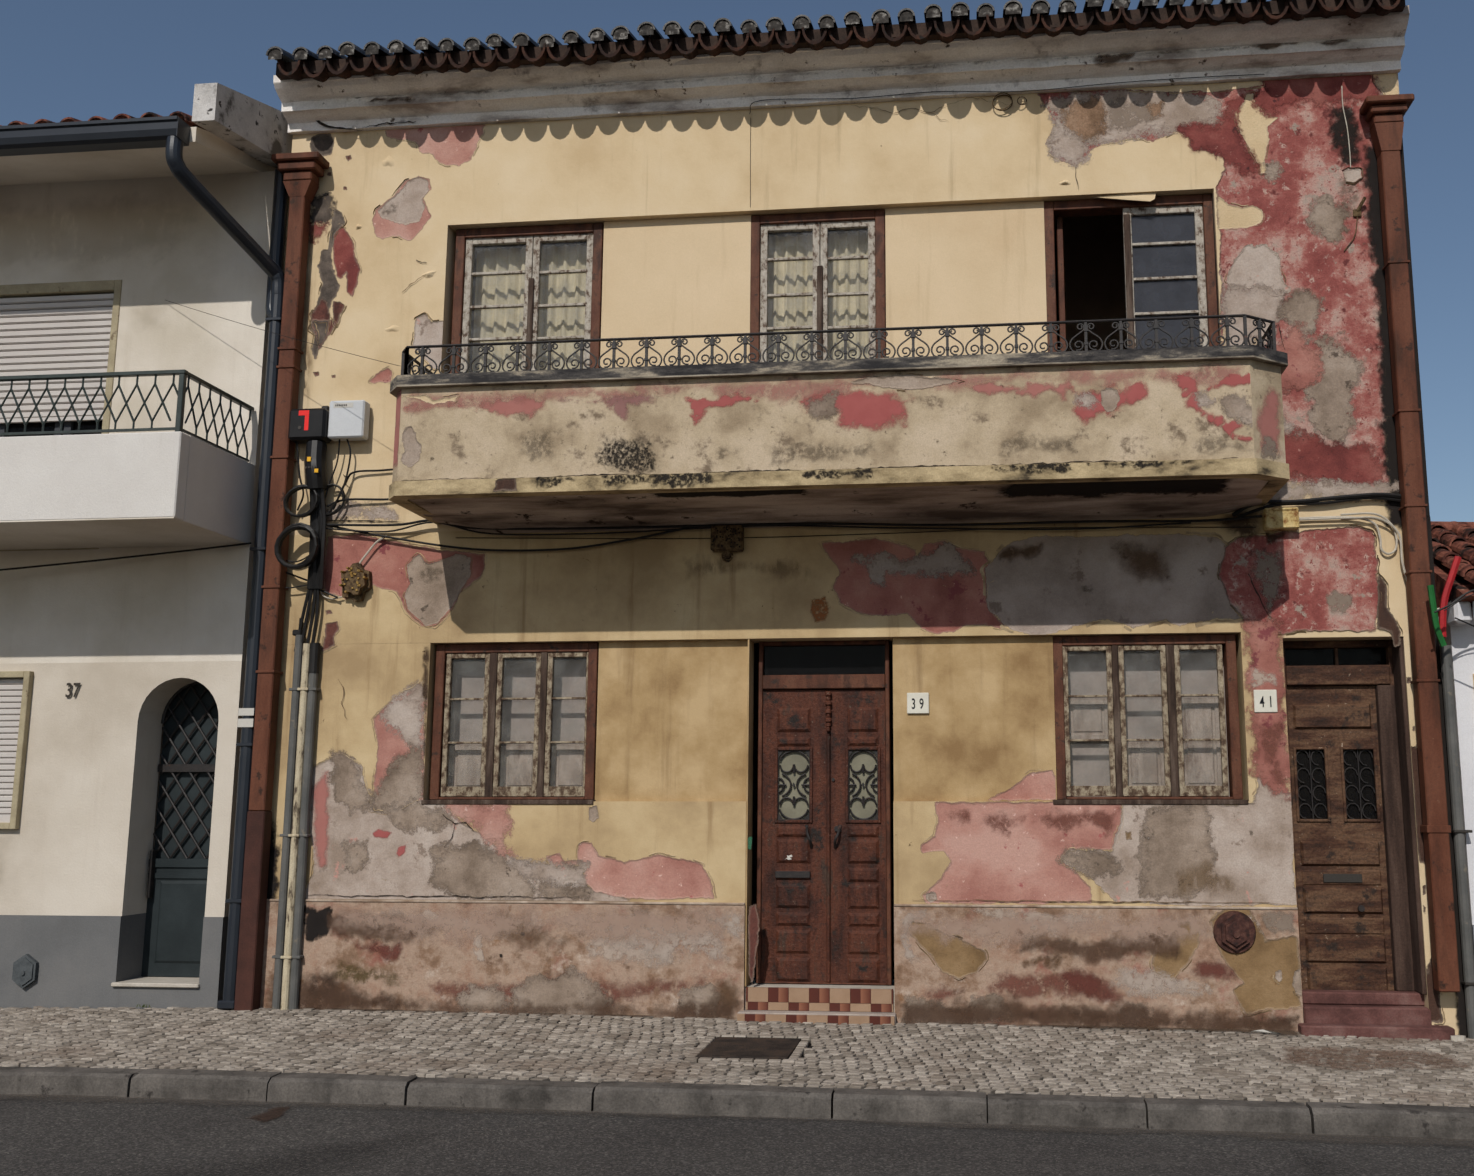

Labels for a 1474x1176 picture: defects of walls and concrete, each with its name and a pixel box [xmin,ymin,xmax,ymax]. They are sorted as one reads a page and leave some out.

peeling [385,125,485,167]
peeling [307,133,362,378]
flaking render [372,176,431,241]
flaking render [411,312,443,371]
peeling [687,73,1400,502]
peeling [594,388,650,419]
damp [595,438,872,498]
flaking render [320,501,487,654]
flaking render [305,682,717,901]
flaking render [818,524,1403,1026]
damp [298,906,742,1019]
damp [902,909,1299,1030]